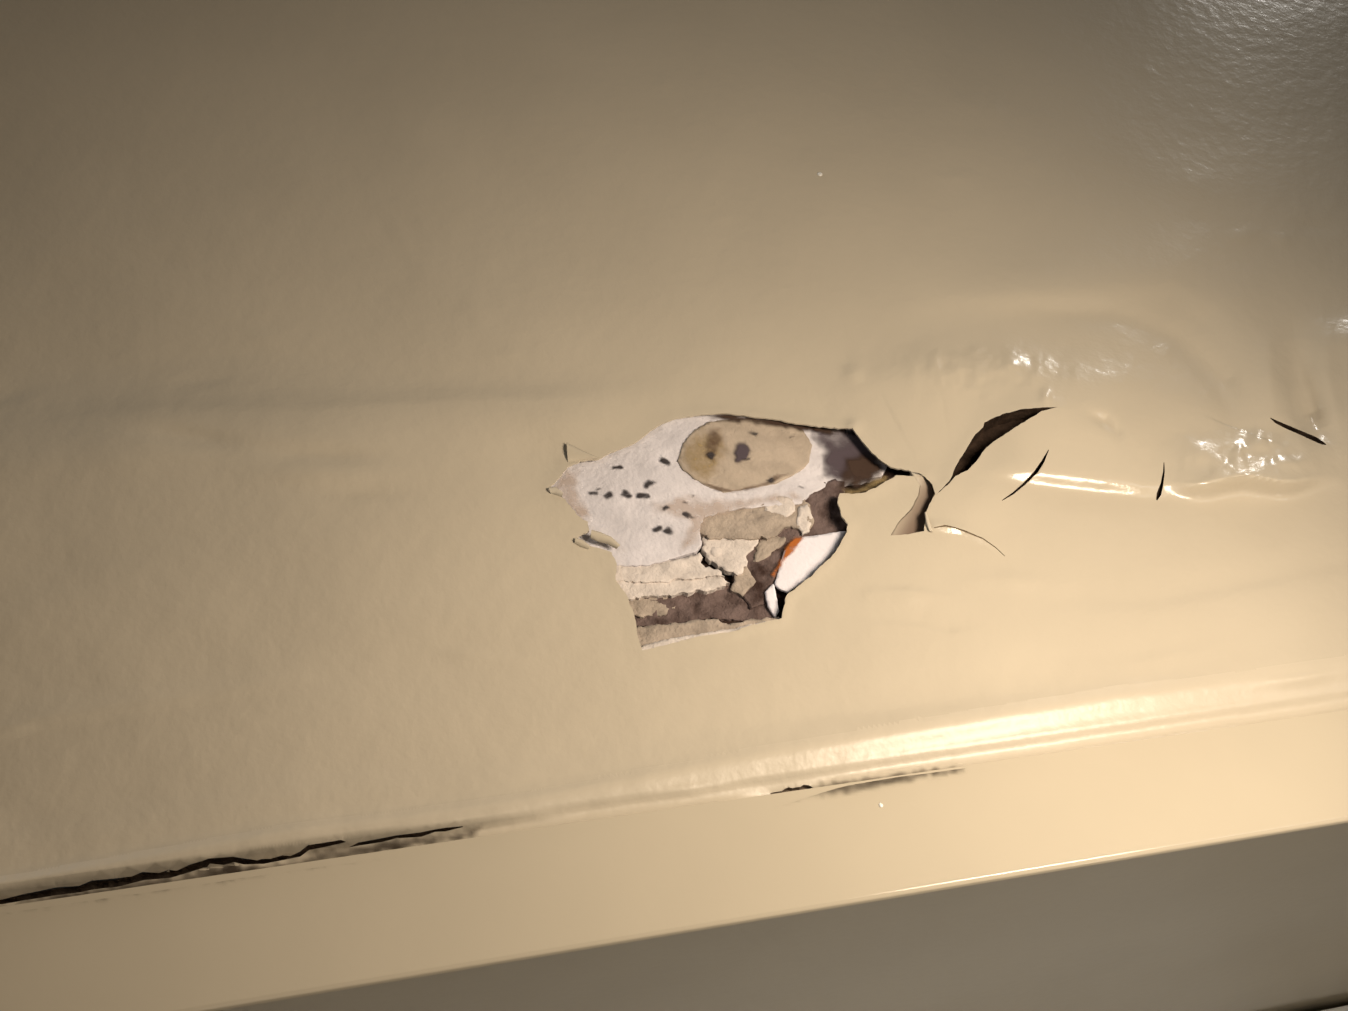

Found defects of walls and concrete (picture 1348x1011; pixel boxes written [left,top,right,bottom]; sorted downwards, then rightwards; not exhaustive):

crack [1271,418,1326,445]
crack [891,407,1055,556]
crack [1156,464,1165,500]
peeling [548,409,1161,650]
crack [0,826,463,904]